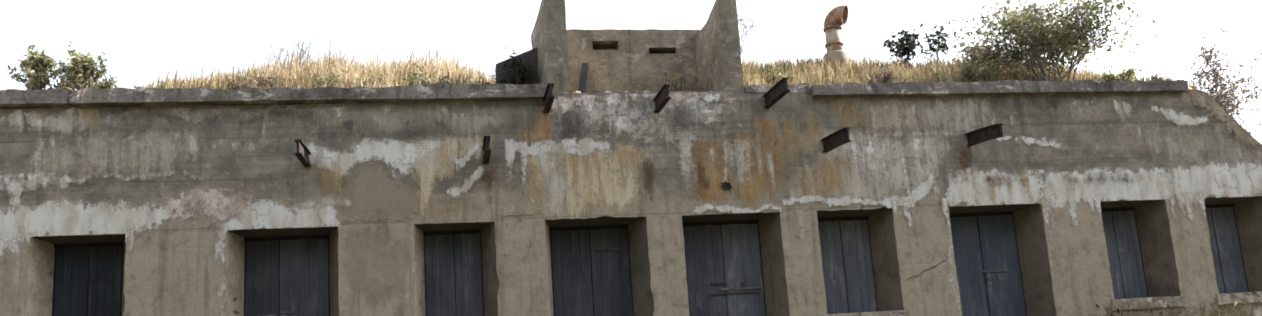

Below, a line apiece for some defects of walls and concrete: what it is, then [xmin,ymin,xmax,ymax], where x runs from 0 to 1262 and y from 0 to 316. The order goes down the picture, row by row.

corrosion [692,117,785,204]
peeling [167,187,260,225]